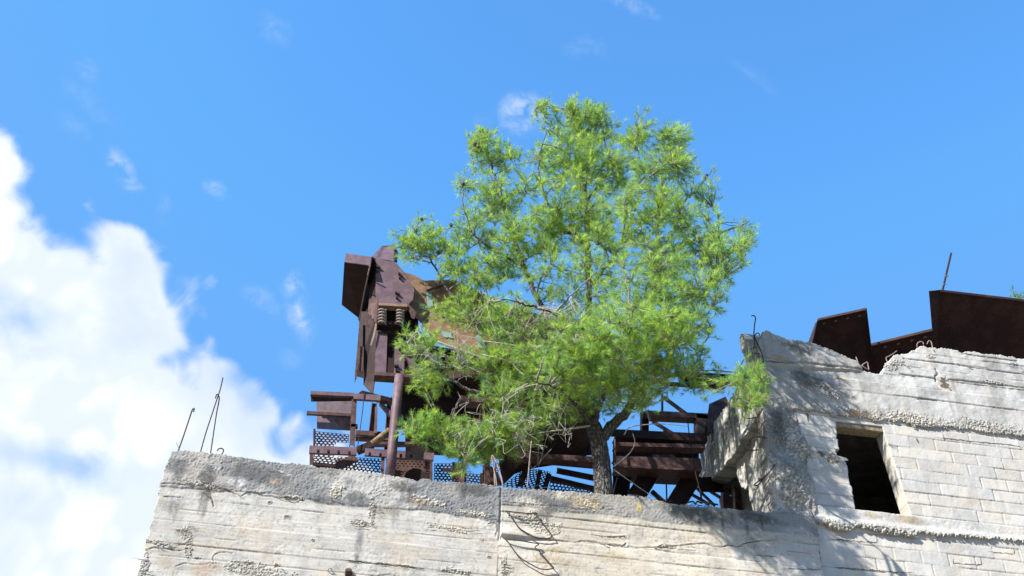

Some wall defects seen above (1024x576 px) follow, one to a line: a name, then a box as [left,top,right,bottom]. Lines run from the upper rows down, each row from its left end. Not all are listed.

spalling [734,315,765,376]
spalling [884,350,911,372]
spalling [200,377,224,455]